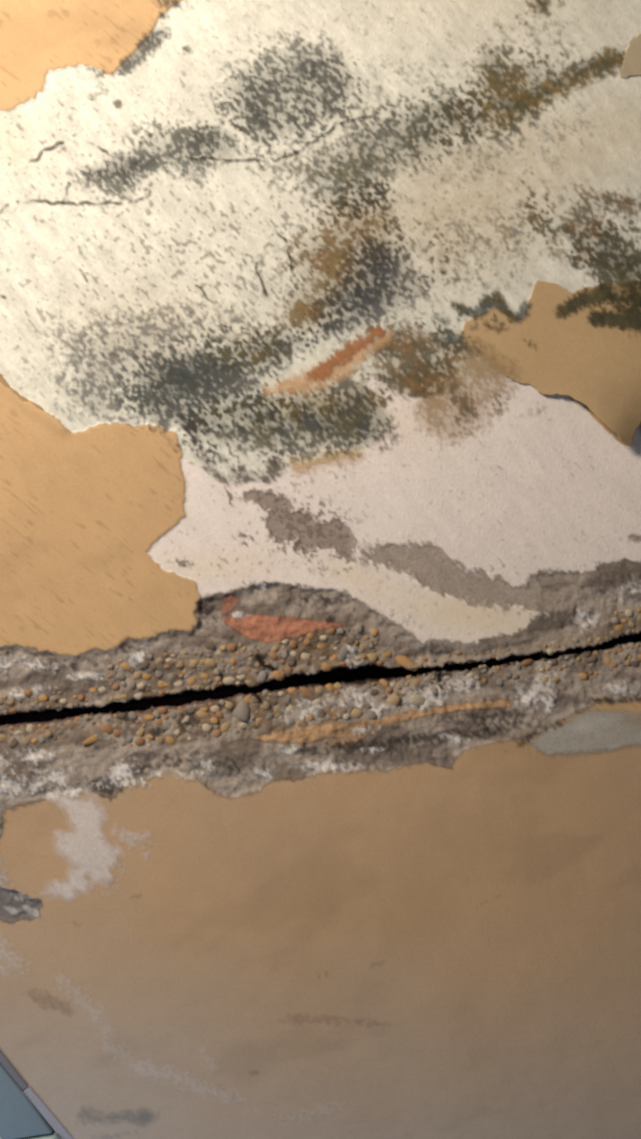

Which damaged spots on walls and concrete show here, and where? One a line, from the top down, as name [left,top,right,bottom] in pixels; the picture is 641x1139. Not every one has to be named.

mould [118,0,179,75]
water stain [74,39,625,483]
mould [550,192,641,329]
rust [266,326,392,393]
peeling [0,0,641,832]
crack [0,632,641,728]
efflorescence [48,790,118,898]
flaking render [0,876,43,923]